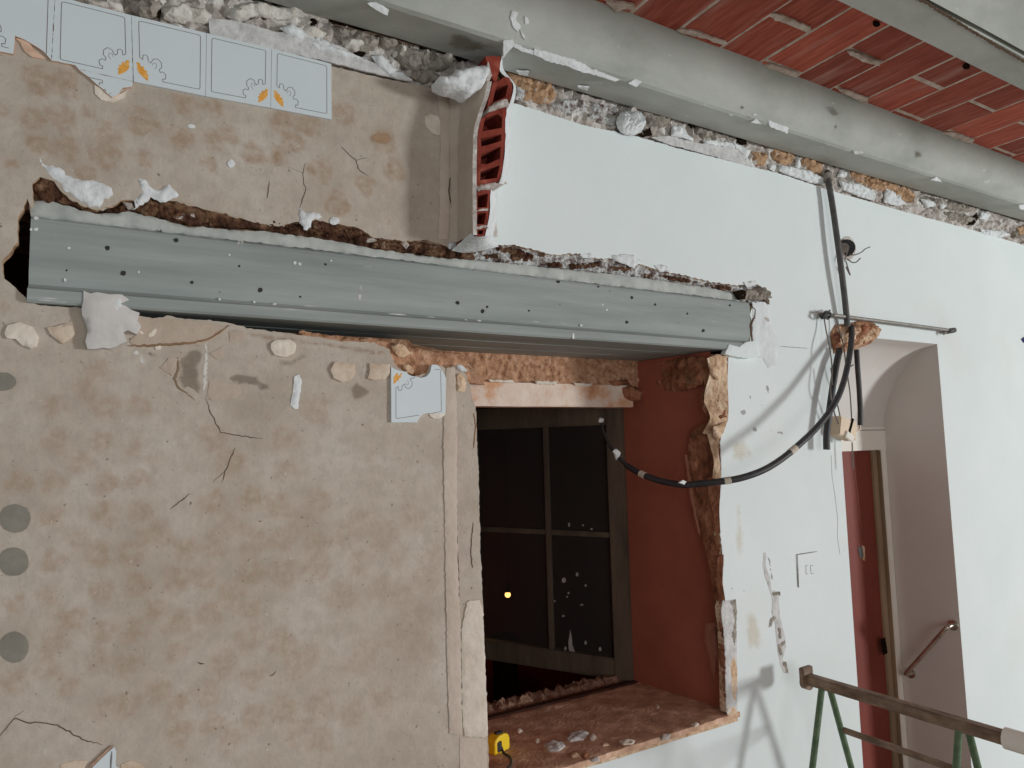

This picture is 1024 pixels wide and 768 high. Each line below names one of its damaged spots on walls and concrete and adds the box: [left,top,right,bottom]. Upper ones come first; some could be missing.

spalling [279,18,413,82]
spalling [29,179,772,306]
spalling [671,123,755,167]
spalling [768,156,825,185]
spalling [837,171,906,206]
spalling [921,199,946,210]
spalling [967,211,1010,238]
flaking render [298,330,642,401]
crack [206,399,262,482]
spalling [581,354,738,768]
peeling [769,616,789,673]
crack [0,711,102,745]